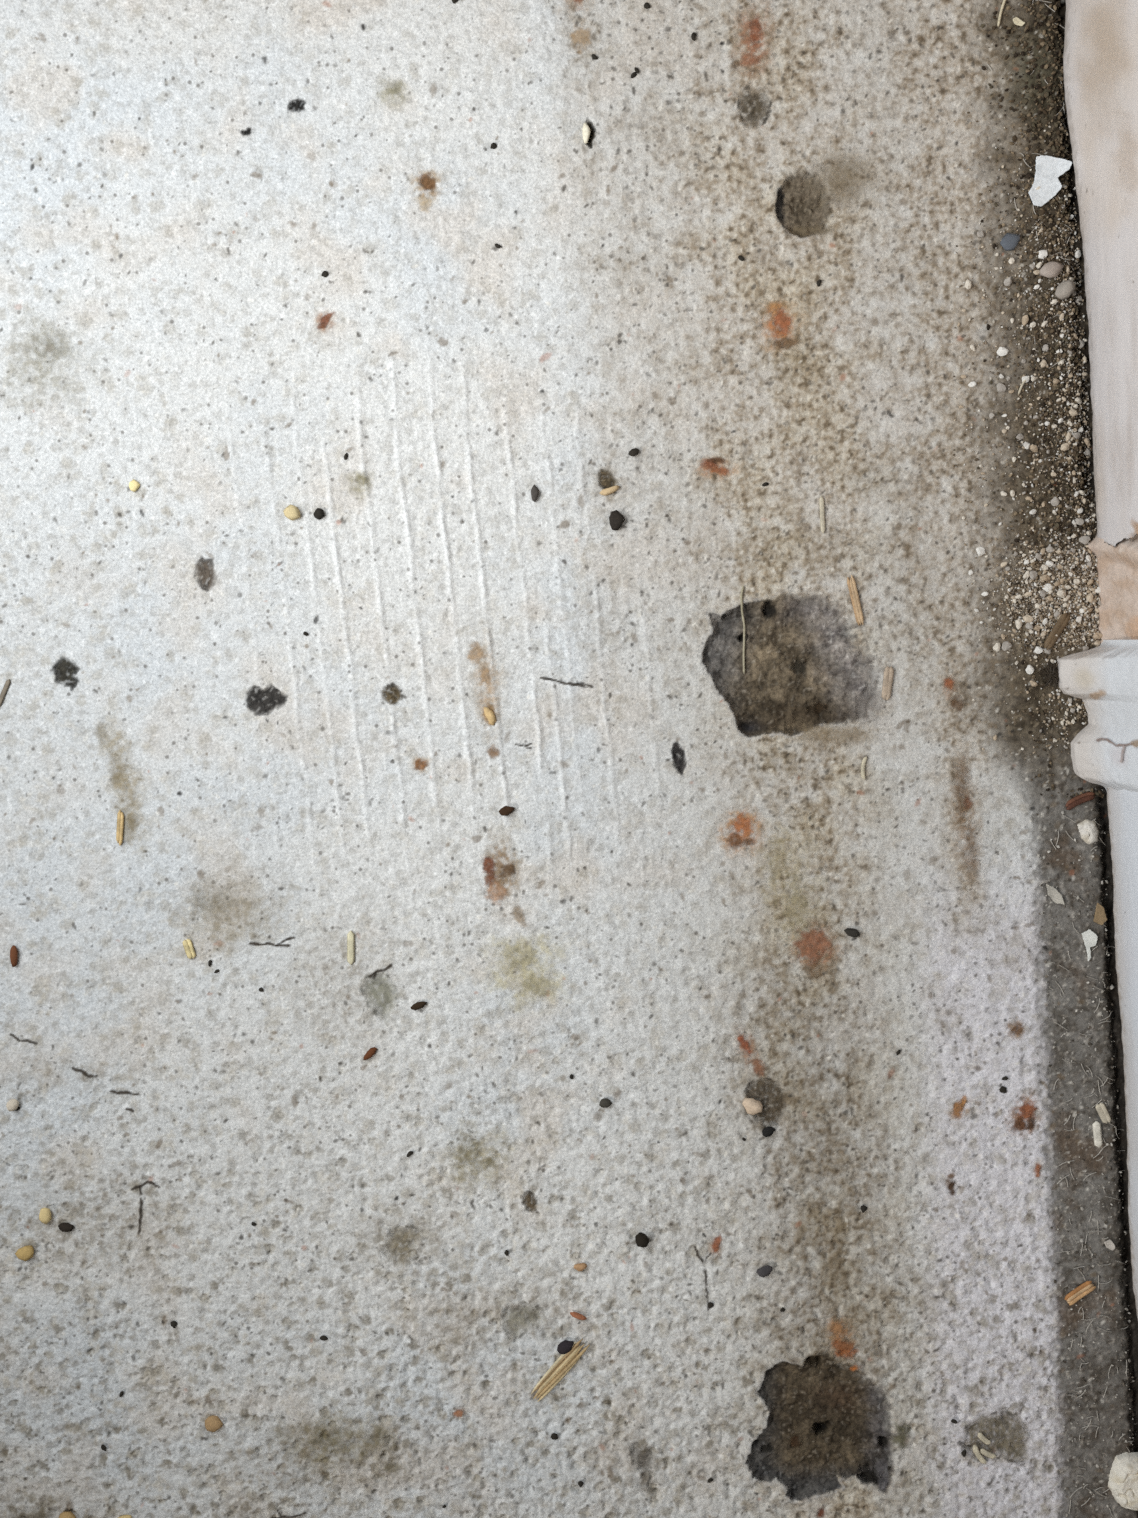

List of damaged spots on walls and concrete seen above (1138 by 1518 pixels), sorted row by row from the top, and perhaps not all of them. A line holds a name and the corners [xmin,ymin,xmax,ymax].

spalling [702,595,873,737]
spalling [746,1341,909,1501]